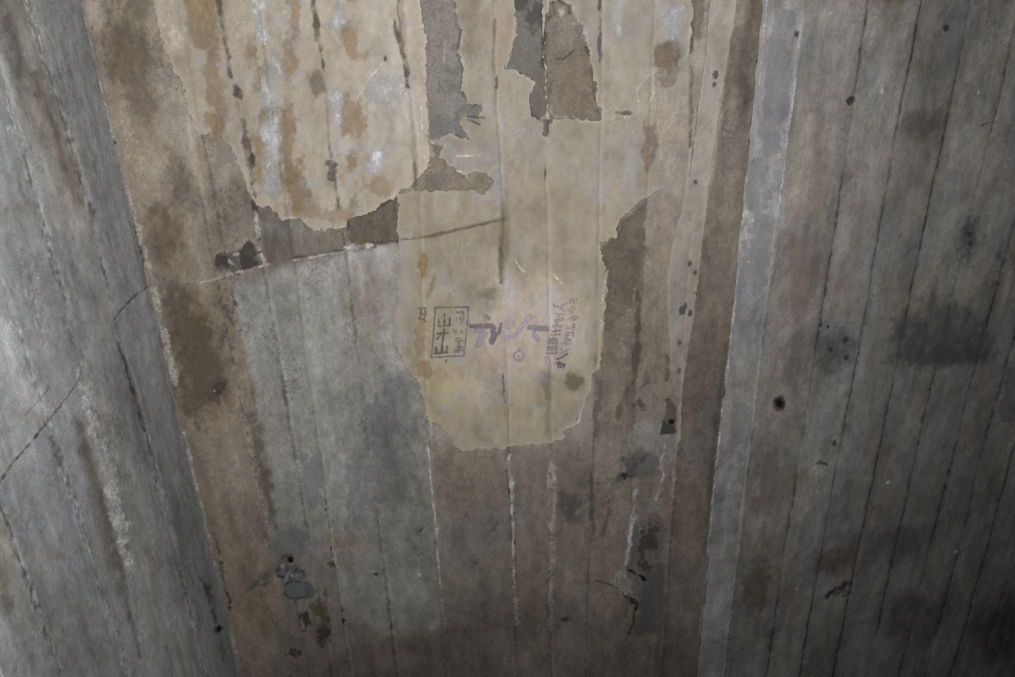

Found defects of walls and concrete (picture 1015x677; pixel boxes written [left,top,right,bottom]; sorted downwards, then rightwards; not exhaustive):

peeling [412,0,493,195]
peeling [504,0,599,137]
crack [183,220,496,286]
peeling [346,198,399,249]
peeling [601,208,644,330]
crack [2,371,83,479]
crack [118,344,156,472]